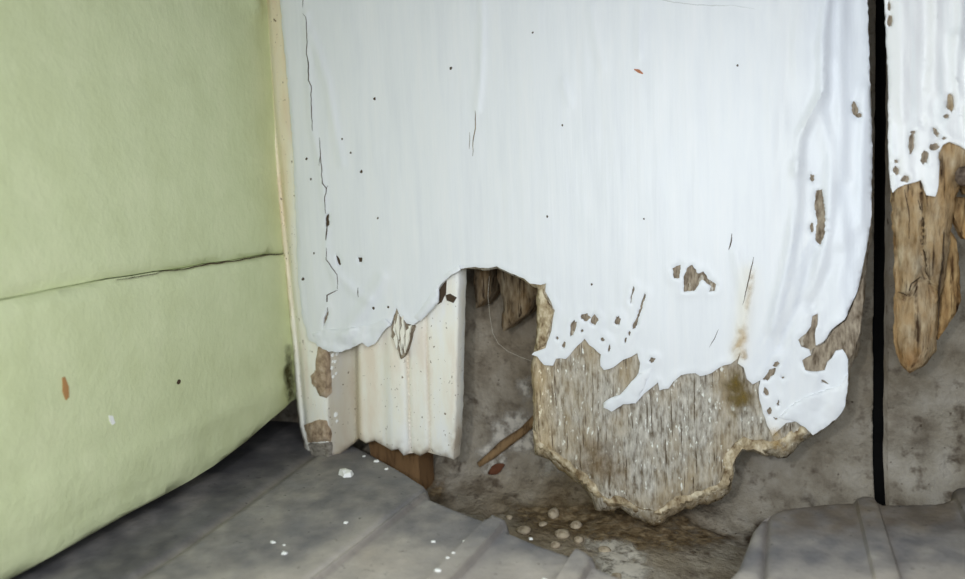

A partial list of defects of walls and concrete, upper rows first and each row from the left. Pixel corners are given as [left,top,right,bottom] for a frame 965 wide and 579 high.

crack [303,14,358,310]
peeling [908,128,946,164]
crack [117,254,282,280]
peeling [414,266,461,321]
spalling [535,289,598,350]
peeling [615,294,646,343]
peeling [672,265,716,292]
peeling [311,306,391,398]
peeling [763,278,864,435]
peeling [603,357,656,412]
spalling [304,420,333,457]
peeling [338,468,354,478]